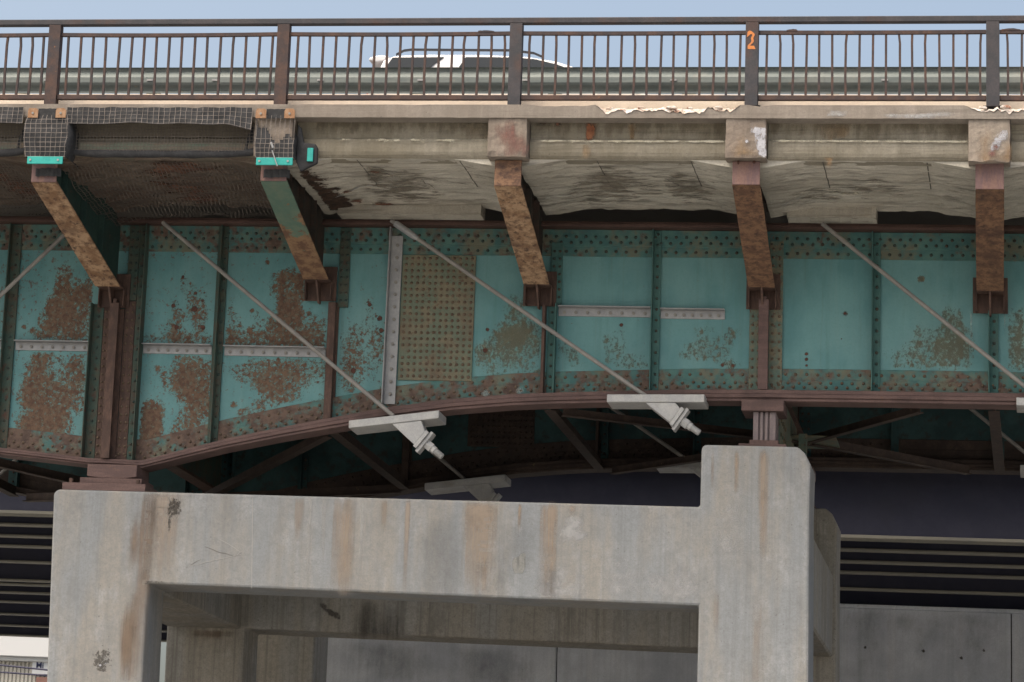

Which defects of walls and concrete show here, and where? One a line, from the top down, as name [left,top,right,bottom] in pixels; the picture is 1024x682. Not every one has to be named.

spalling [596,105,740,114]
rust [14,265,93,434]
rust [139,275,212,440]
rust [225,260,327,416]
rust [891,308,974,370]
peeling [166,499,181,531]
peeling [93,645,110,672]